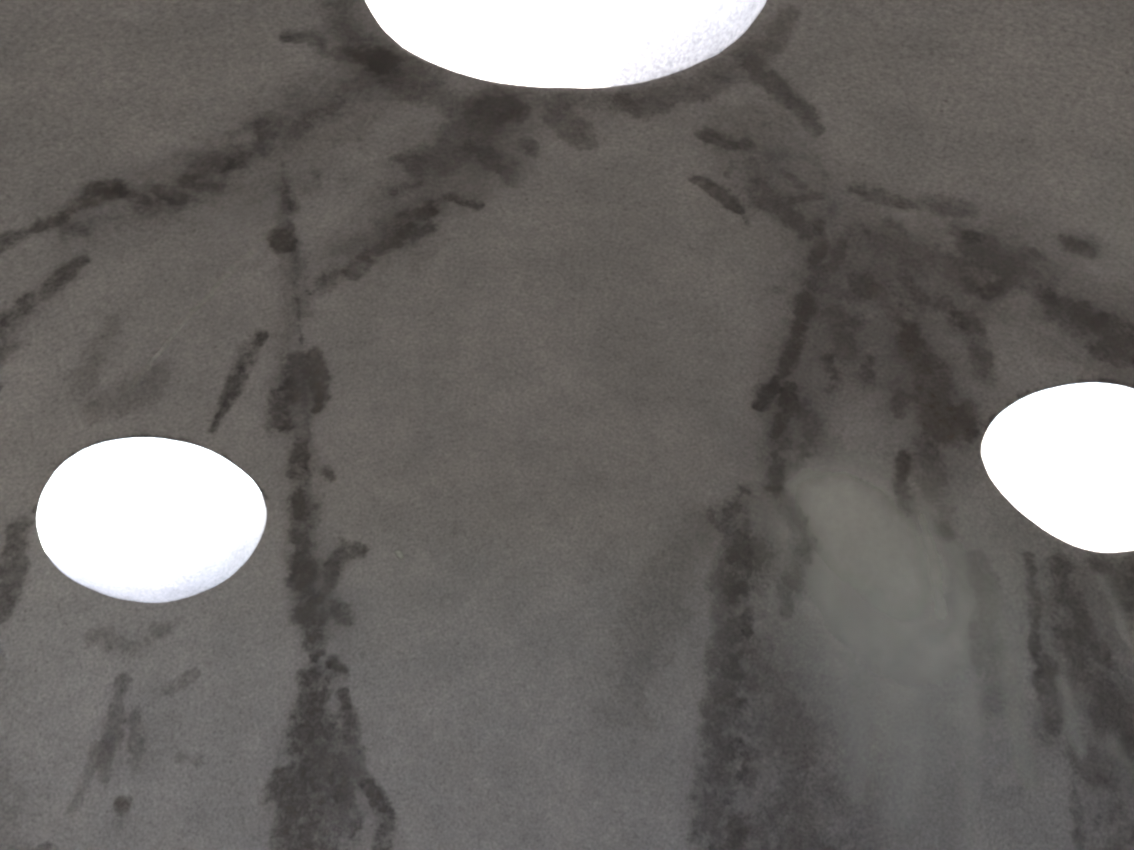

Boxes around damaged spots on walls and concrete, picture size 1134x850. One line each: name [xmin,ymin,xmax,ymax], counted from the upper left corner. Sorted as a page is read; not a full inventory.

water stain [343,195,483,280]
water stain [689,176,747,224]
water stain [211,332,268,432]
water stain [269,347,331,431]
water stain [752,220,845,491]
water stain [1069,379,1134,390]
water stain [0,435,191,622]
water stain [796,481,968,655]
water stain [265,444,395,850]